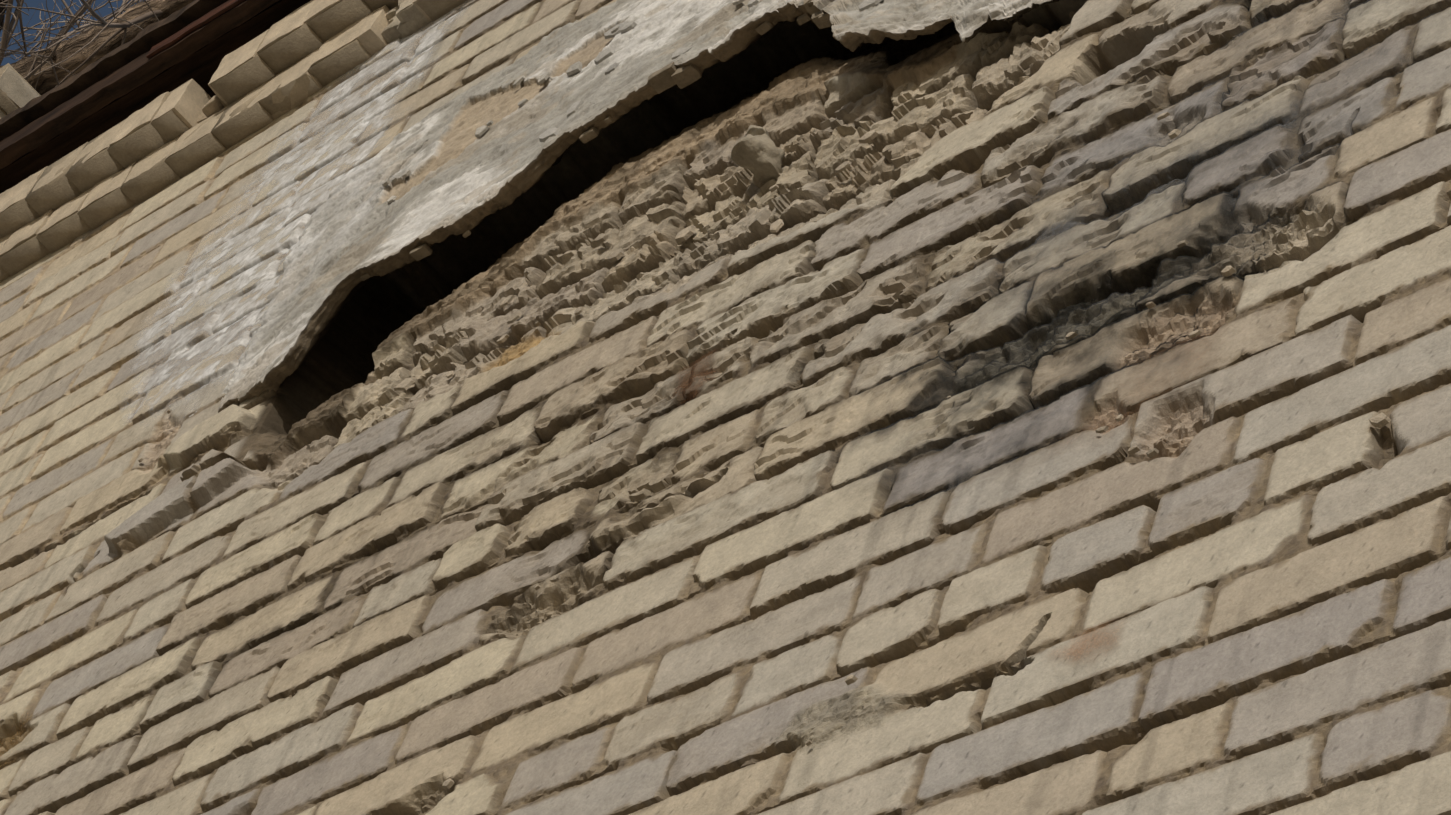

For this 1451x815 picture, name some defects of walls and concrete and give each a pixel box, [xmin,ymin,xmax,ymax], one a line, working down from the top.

spalling [1097,26,1149,77]
spalling [1146,107,1206,147]
leakage [1243,104,1298,142]
leakage [1035,150,1210,243]
spalling [218,0,1076,493]
spalling [947,201,1340,399]
spalling [1087,391,1216,465]
spalling [0,717,37,757]